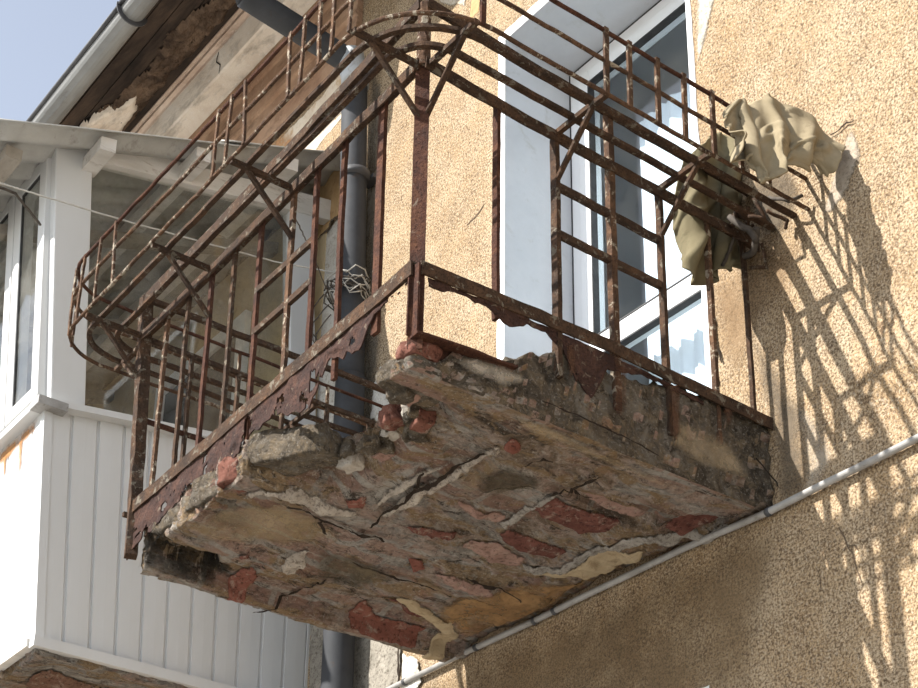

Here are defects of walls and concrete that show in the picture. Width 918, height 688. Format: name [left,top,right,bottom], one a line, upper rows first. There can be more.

peeling [440,0,480,17]
spalling [89,0,236,132]
peeling [312,171,340,337]
rust [0,426,34,474]
spalling [152,341,521,536]
crack [287,453,486,542]
crack [353,562,452,597]
crack [466,578,521,603]
crack [550,477,600,498]
spalling [458,493,727,580]
leakage [763,362,800,491]
spalling [348,598,459,688]